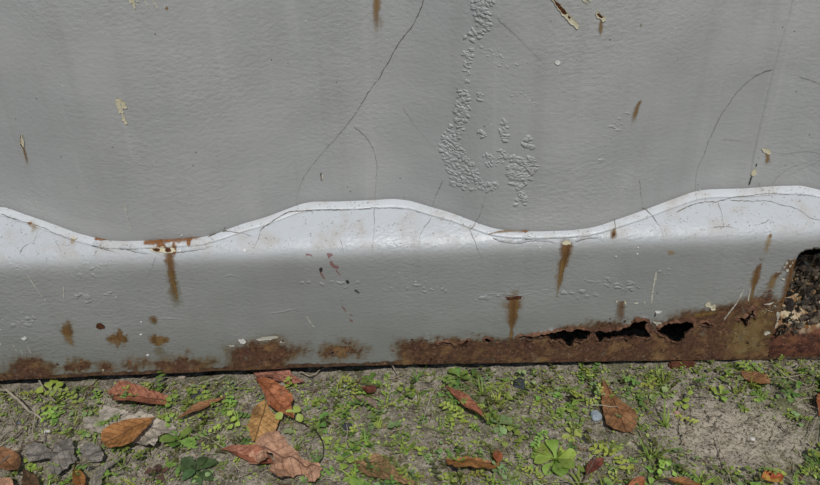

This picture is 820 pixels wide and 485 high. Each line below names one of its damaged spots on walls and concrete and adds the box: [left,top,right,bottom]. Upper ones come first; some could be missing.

spalling [552,0,579,29]
crack [208,0,424,245]
corrosion [144,237,198,296]
corrosion [559,240,571,285]
corrosion [0,253,820,381]